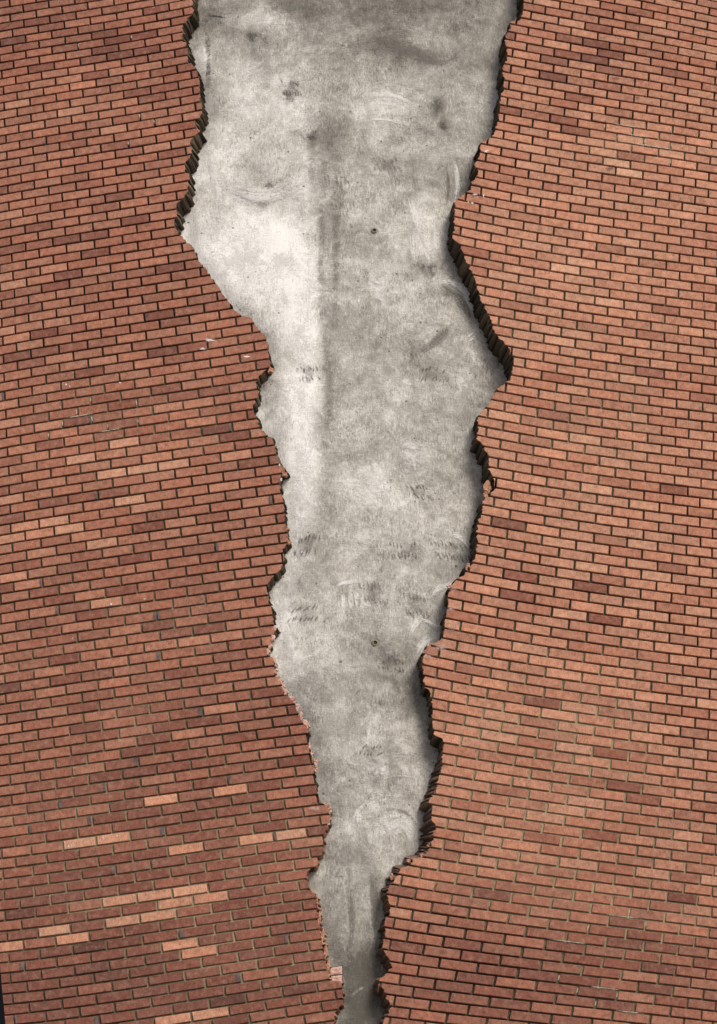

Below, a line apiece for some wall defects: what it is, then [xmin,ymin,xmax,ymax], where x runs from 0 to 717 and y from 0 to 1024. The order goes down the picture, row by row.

spalling [482,480,492,499]
spalling [267,625,310,729]
spalling [316,897,342,982]